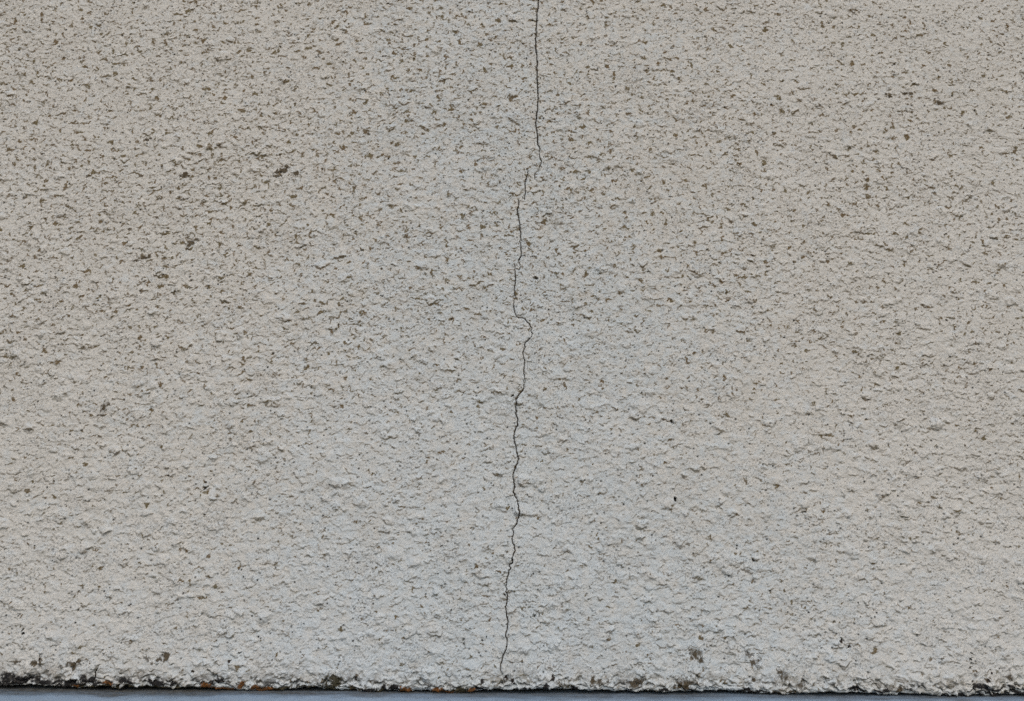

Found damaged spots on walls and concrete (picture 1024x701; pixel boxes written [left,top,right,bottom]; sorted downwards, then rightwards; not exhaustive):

crack [500,0,542,680]